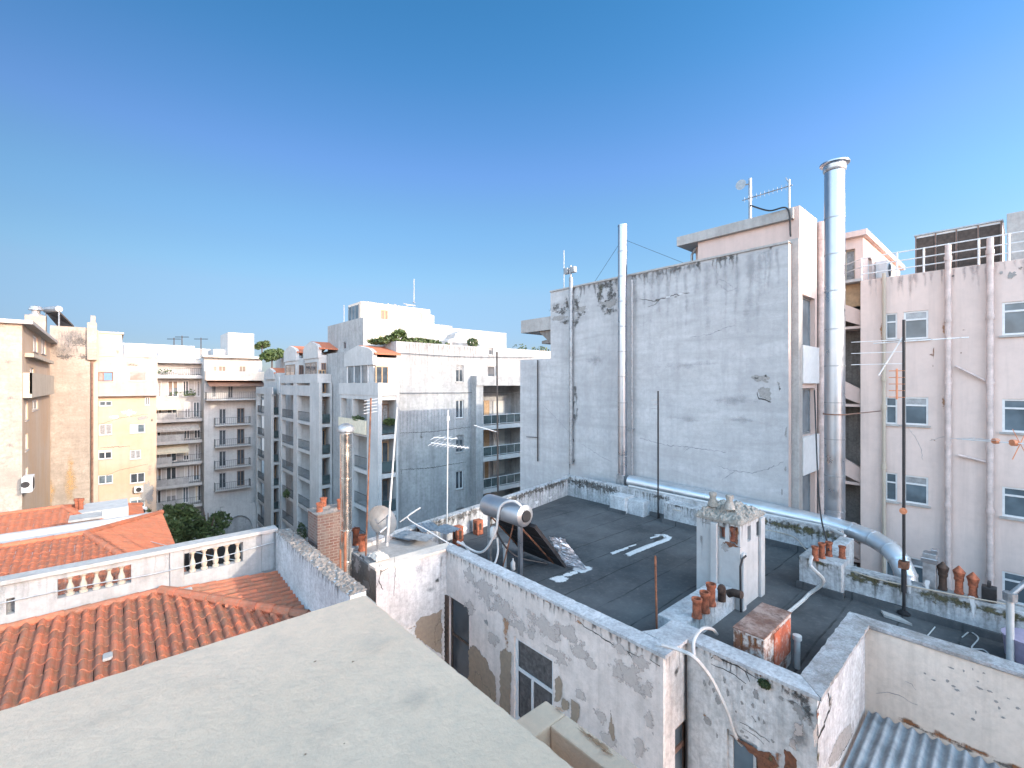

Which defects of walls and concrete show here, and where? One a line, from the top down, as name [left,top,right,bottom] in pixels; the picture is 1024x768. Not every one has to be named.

crack [642,293,687,307]
flaking render [751,375,781,402]
leakage [899,576,976,618]
peeling [463,566,653,699]
peeling [561,689,586,710]
peeling [594,710,617,747]
flaking render [703,677,797,768]
crack [813,693,833,766]